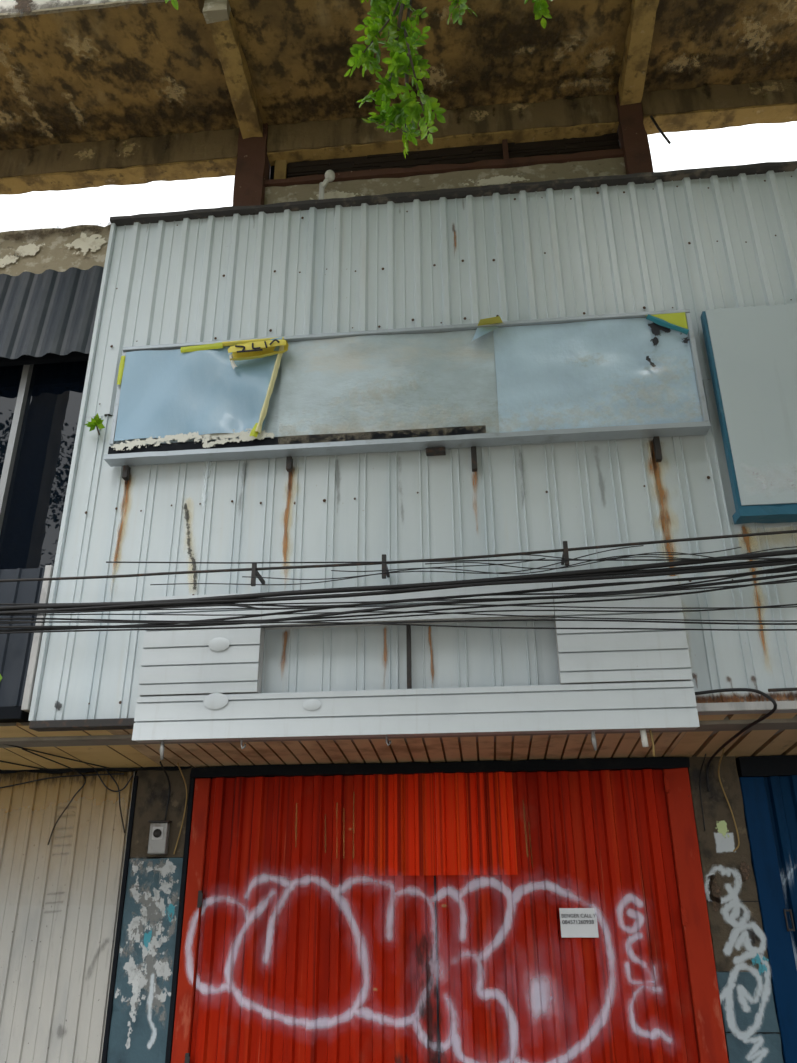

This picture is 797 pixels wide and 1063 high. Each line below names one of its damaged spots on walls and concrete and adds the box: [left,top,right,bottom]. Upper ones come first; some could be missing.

damp [0,0,179,19]
damp [0,47,237,166]
damp [262,1,622,133]
damp [643,0,797,99]
peeling [0,242,45,268]
peeling [65,232,106,256]
rust [113,475,131,567]
rust [283,468,295,584]
rust [648,440,676,576]
rust [741,525,766,654]